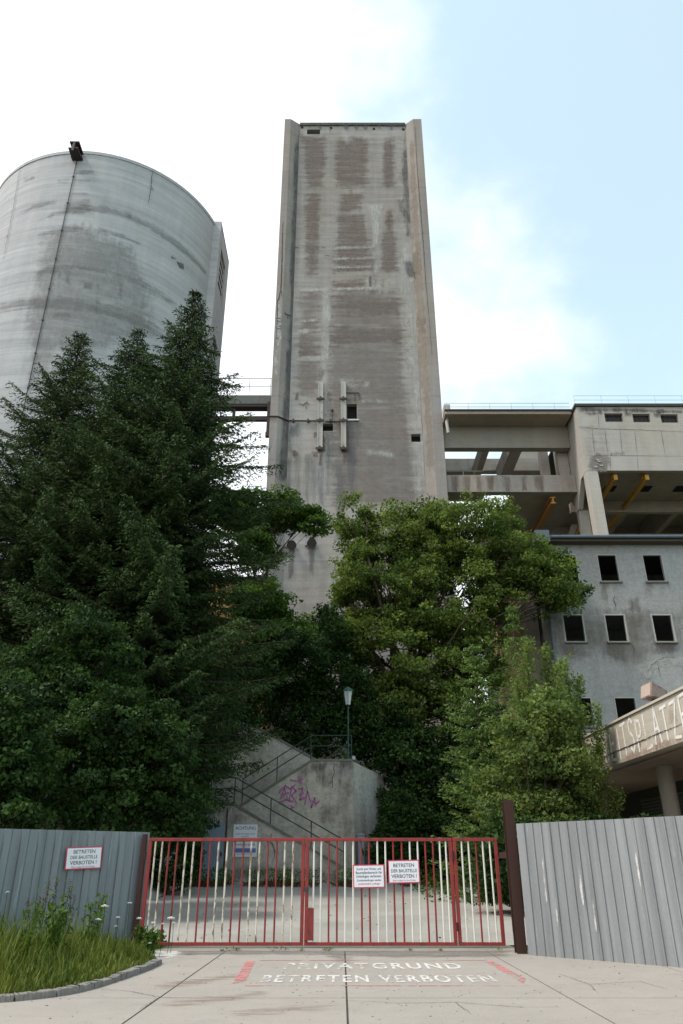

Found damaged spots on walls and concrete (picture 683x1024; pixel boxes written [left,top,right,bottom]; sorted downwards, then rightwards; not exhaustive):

water stain [280,123,433,511]